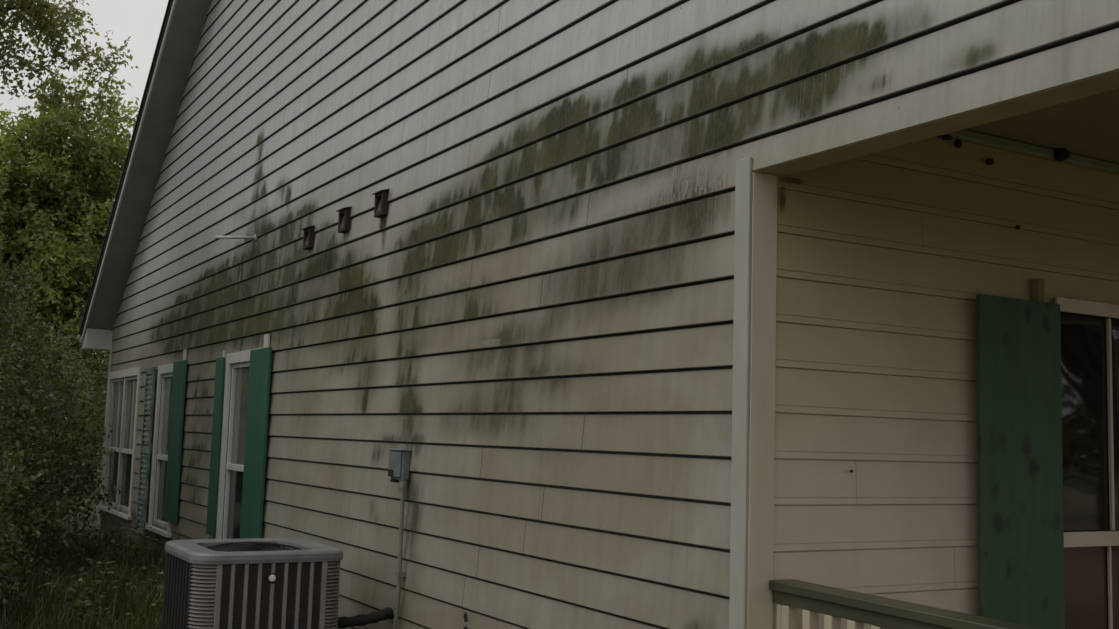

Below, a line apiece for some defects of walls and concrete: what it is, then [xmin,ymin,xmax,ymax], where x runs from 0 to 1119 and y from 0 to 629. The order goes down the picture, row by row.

water stain [152,135,379,357]
water stain [374,21,887,458]